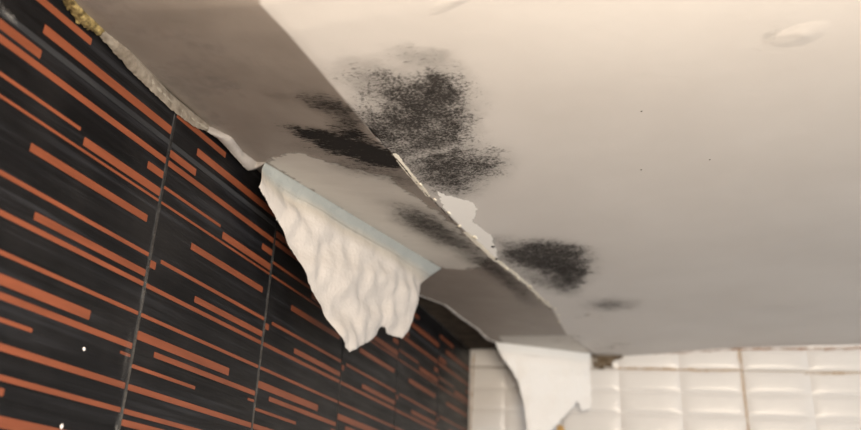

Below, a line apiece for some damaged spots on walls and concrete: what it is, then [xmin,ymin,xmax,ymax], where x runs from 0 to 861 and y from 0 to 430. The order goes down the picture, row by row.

peeling [63,0,498,352]
mould [286,69,502,195]
mould [395,204,593,295]
peeling [496,335,592,430]